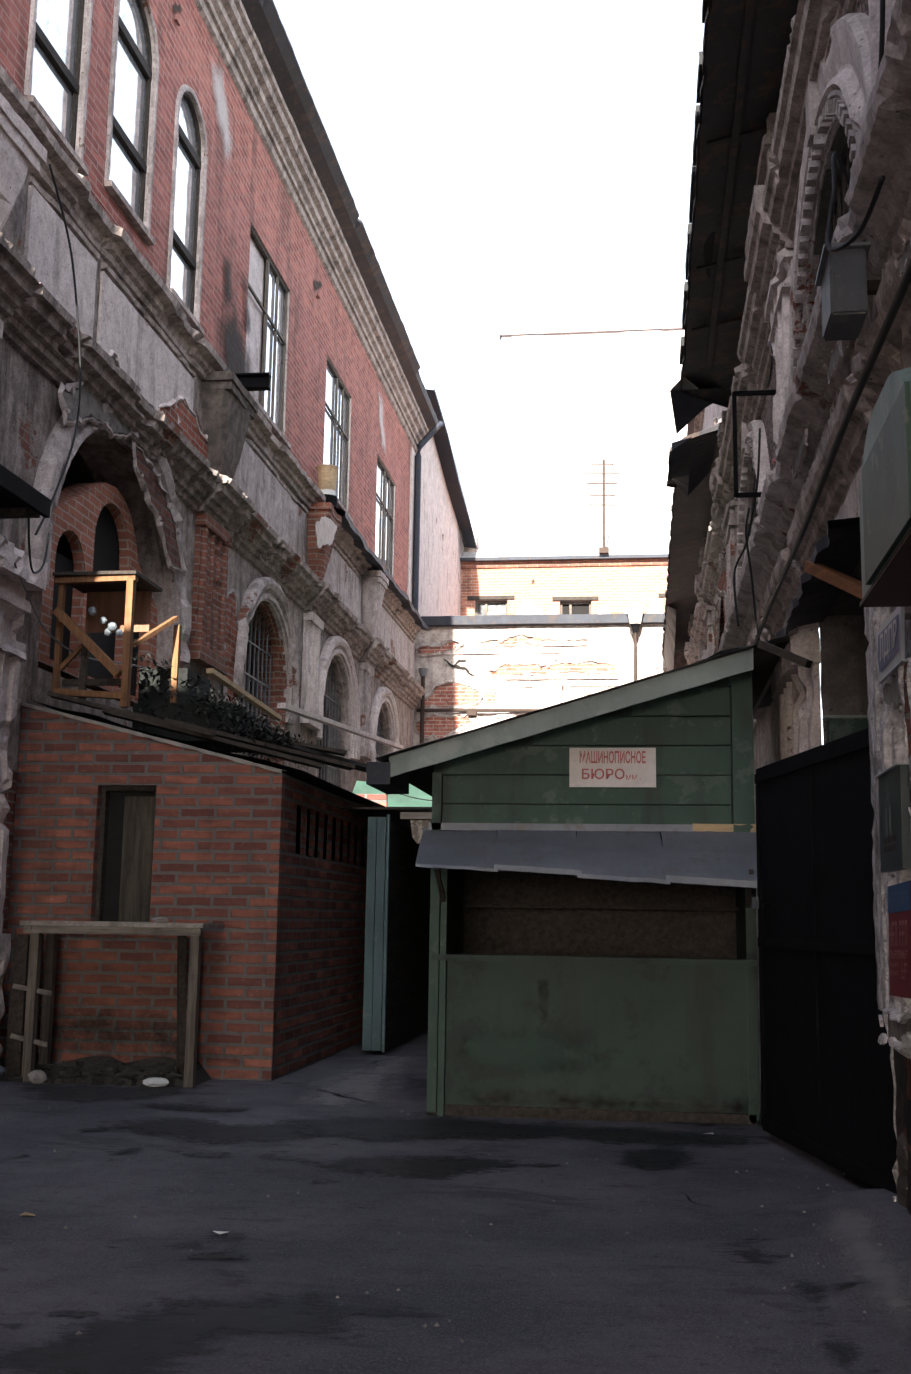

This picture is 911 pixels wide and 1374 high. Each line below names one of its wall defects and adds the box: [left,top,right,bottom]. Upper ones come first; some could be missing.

spalling [413,631,619,741]
spalling [898,657,911,817]
damp [23,1084,774,1184]
damp [0,1293,436,1374]